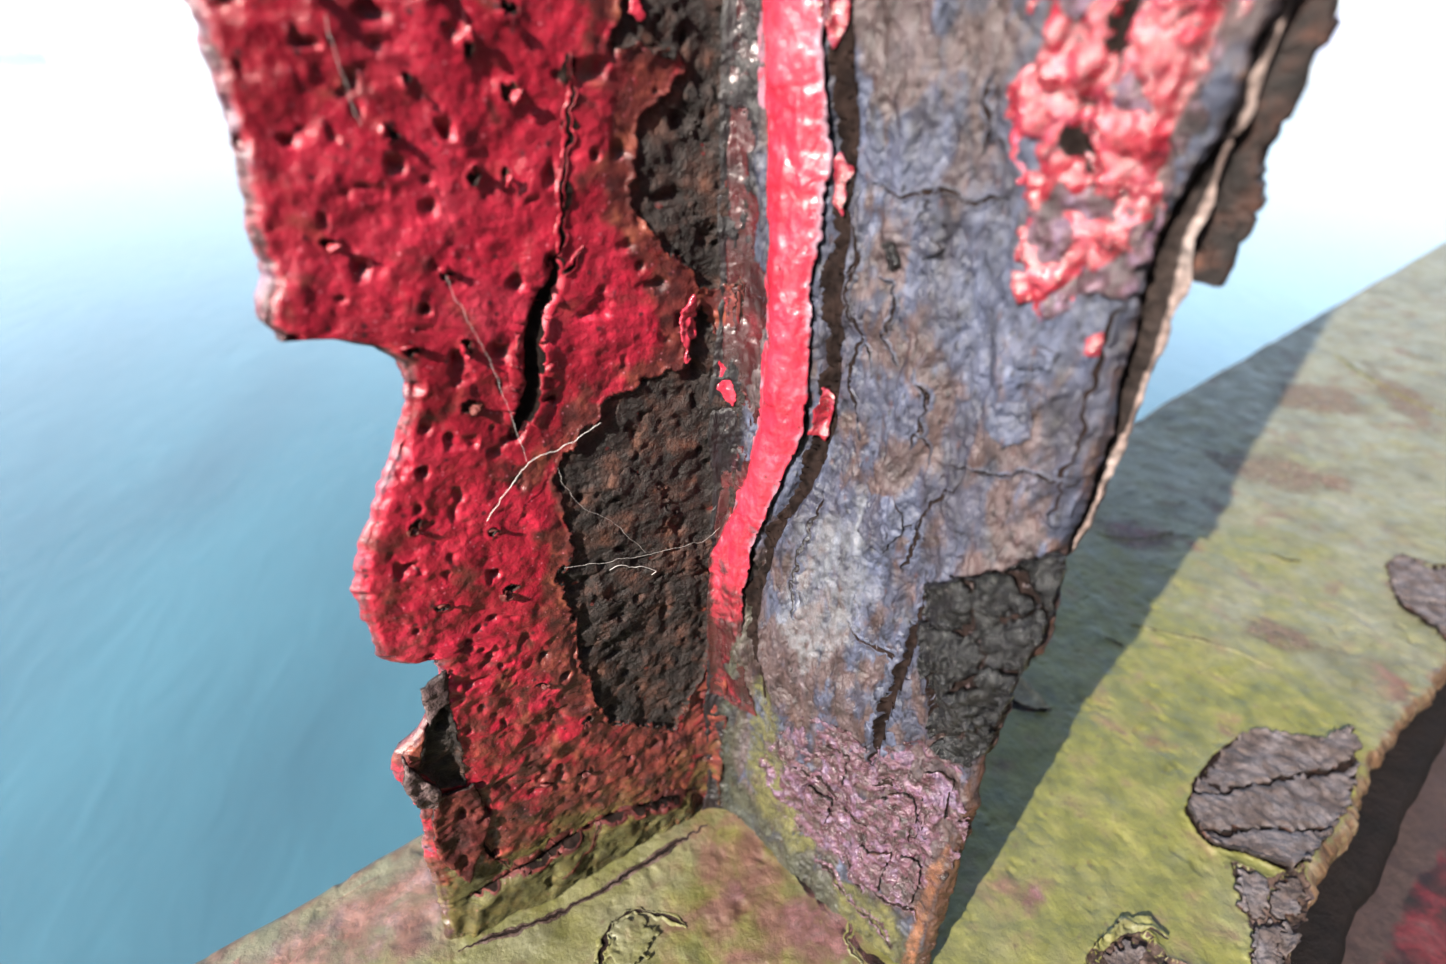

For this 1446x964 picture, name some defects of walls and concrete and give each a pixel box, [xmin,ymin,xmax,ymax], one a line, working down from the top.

crack [1141,0,1238,234]
crack [498,52,584,435]
crack [744,0,1159,773]
peeling [758,0,1342,906]
peeling [1385,552,1446,639]
spalling [401,669,491,883]
crack [458,787,708,964]
crack [794,855,925,964]
peeling [1187,725,1364,964]